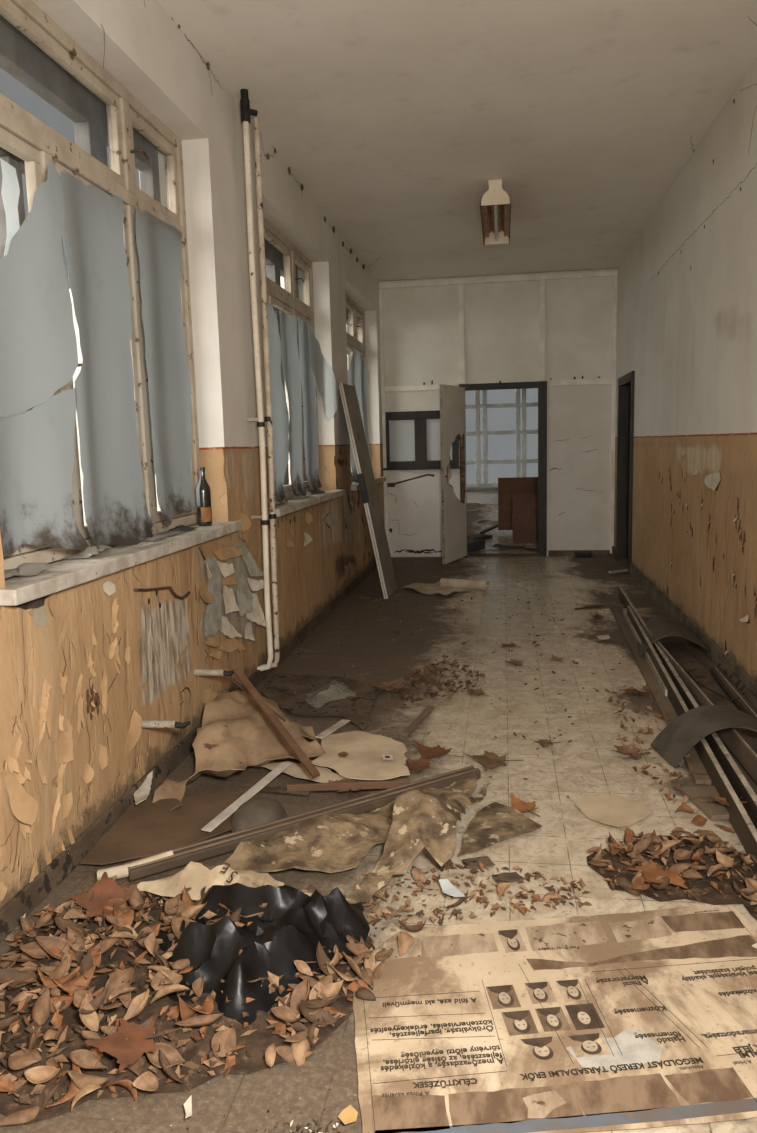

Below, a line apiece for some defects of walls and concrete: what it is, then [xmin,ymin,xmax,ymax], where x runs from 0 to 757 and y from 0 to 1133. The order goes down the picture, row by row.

peeling [659,467,721,538]
peeling [732,571,757,624]
peeling [0,507,280,883]